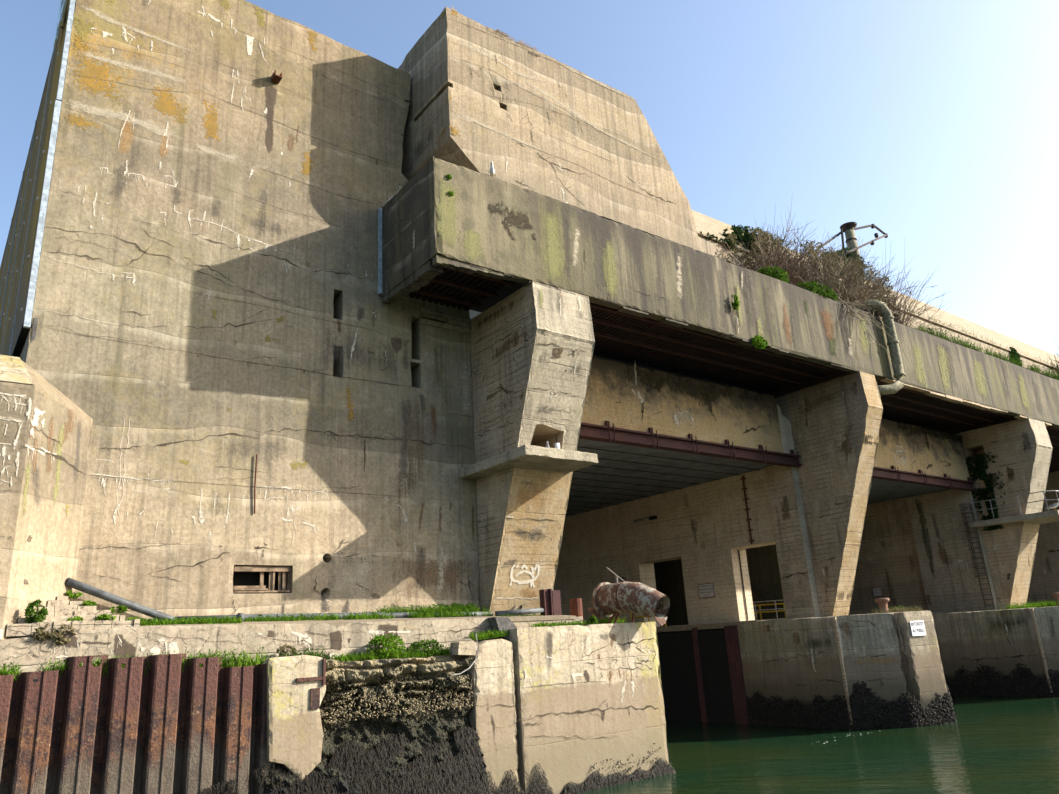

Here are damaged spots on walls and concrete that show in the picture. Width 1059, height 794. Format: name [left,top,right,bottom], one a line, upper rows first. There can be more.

water stain [264,85,299,154]
crack [27,181,424,349]
water stain [531,215,580,281]
water stain [595,232,617,293]
water stain [677,257,703,313]
crack [102,326,585,489]
crack [27,422,86,477]
crack [80,542,230,586]
crack [255,543,279,561]
crack [506,516,561,540]
crack [3,570,540,658]
crack [468,626,658,781]